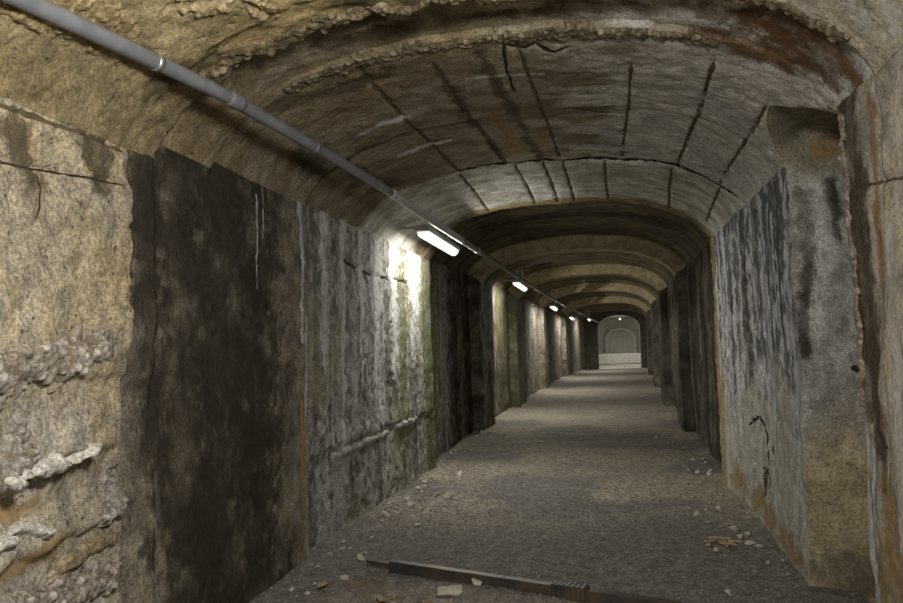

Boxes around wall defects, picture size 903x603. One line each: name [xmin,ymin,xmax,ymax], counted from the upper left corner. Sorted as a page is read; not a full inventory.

leakage [0,112,51,192]
crack [0,160,125,223]
leakage [328,0,424,44]
crack [356,41,766,222]
corrosion [690,0,863,142]
crack [852,176,903,190]
leakage [126,147,307,603]
leakage [318,210,421,461]
leakage [644,85,813,540]
crack [749,415,771,497]
corrosion [718,369,803,567]
corrosion [848,97,903,603]